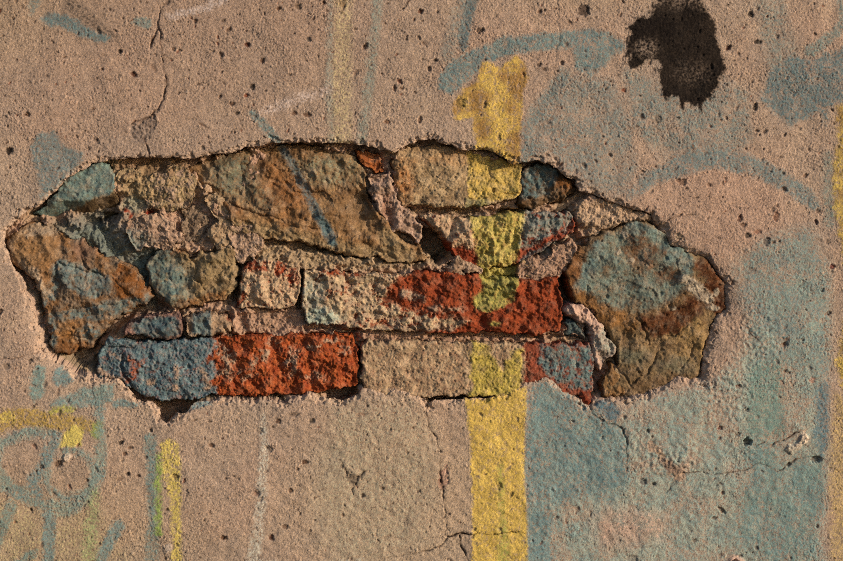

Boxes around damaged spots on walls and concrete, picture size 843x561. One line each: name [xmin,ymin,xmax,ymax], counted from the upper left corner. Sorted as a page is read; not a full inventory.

crack [130,0,168,158]
spalling [5,139,726,423]
crack [380,404,527,561]